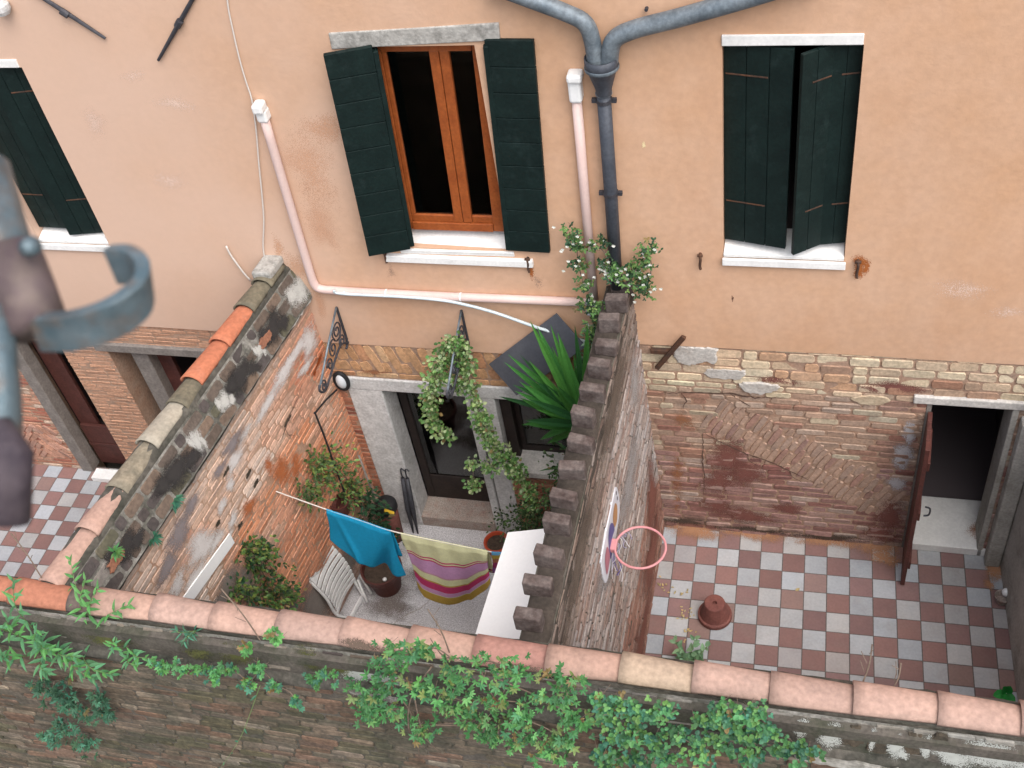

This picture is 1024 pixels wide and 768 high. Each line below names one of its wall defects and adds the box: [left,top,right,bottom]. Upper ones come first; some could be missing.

corrosion [851,255,872,279]
flaking render [673,346,780,395]
damp [150,233,326,596]
crack [662,392,784,408]
damp [665,420,916,544]